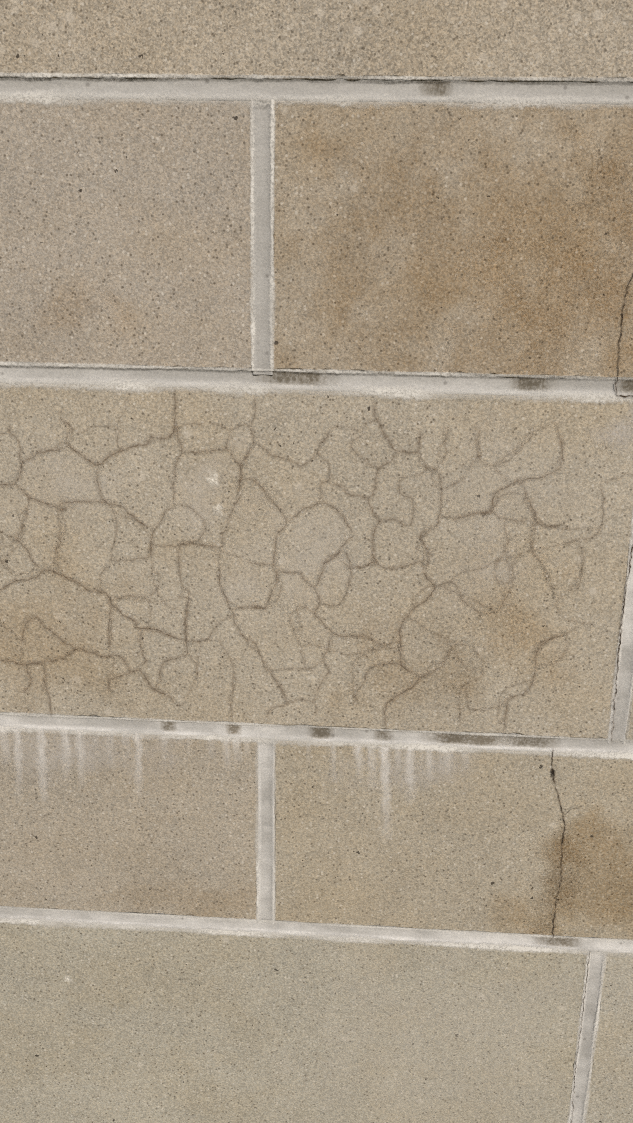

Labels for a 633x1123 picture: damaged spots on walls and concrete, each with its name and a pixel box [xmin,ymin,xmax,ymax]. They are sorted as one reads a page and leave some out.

crack [551,752,565,936]